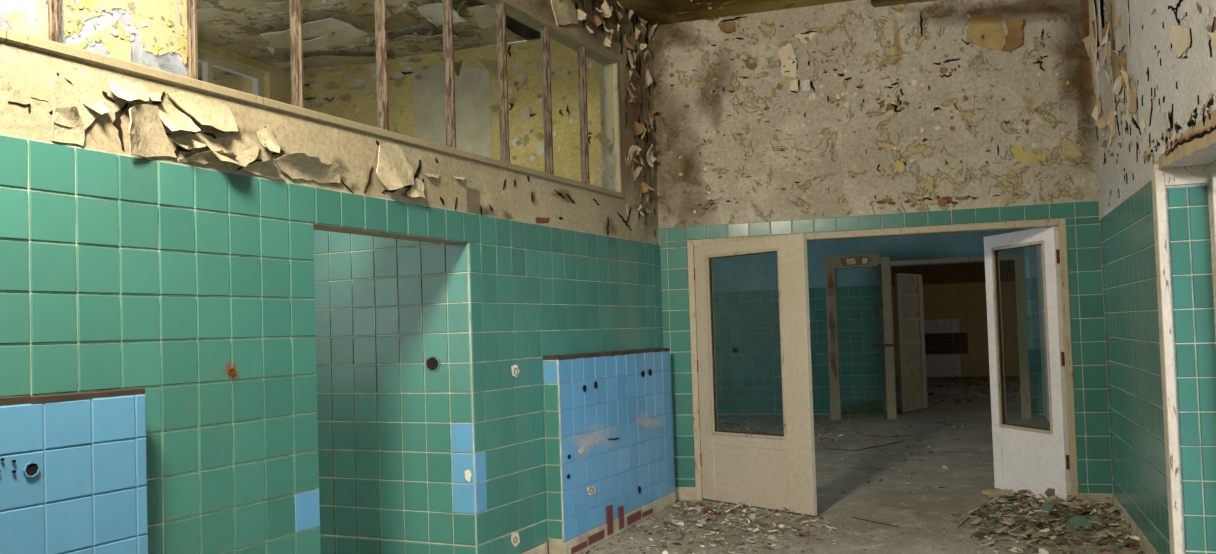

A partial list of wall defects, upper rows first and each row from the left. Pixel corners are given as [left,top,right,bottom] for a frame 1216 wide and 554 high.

flaking render [5,0,570,210]
peeling [551,0,659,237]
damp [674,151,695,213]
peeling [674,0,1079,214]
damp [1062,8,1090,121]